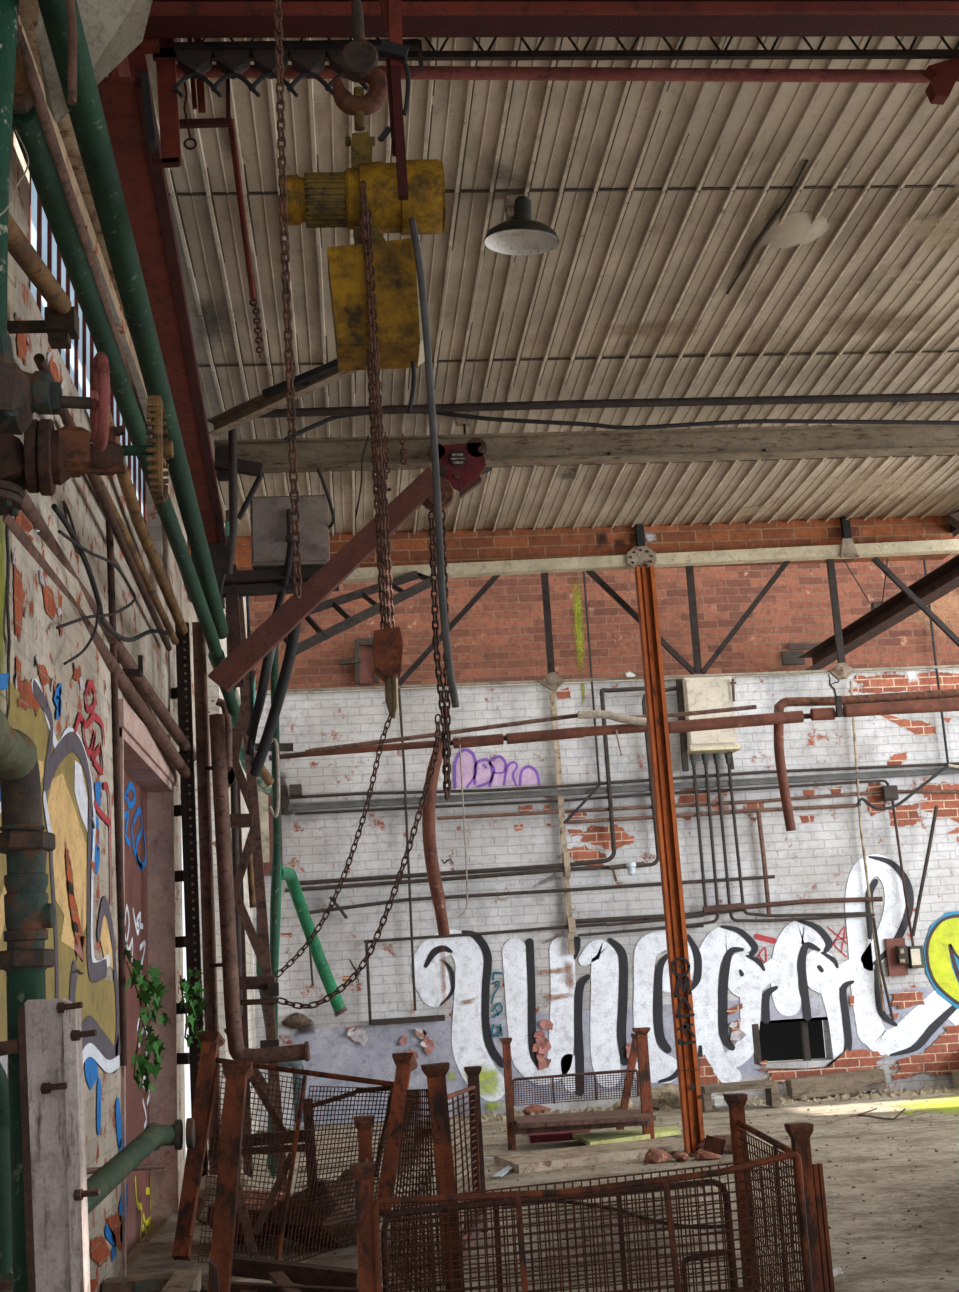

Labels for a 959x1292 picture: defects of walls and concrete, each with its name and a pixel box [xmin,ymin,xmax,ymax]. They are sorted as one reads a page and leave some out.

peeling [556,688,571,700]
peeling [848,671,959,694]
peeling [882,715,951,736]
peeling [887,752,908,765]
peeling [514,804,551,831]
peeling [866,782,959,834]
peeling [567,813,634,867]
peeling [754,1024,959,1083]